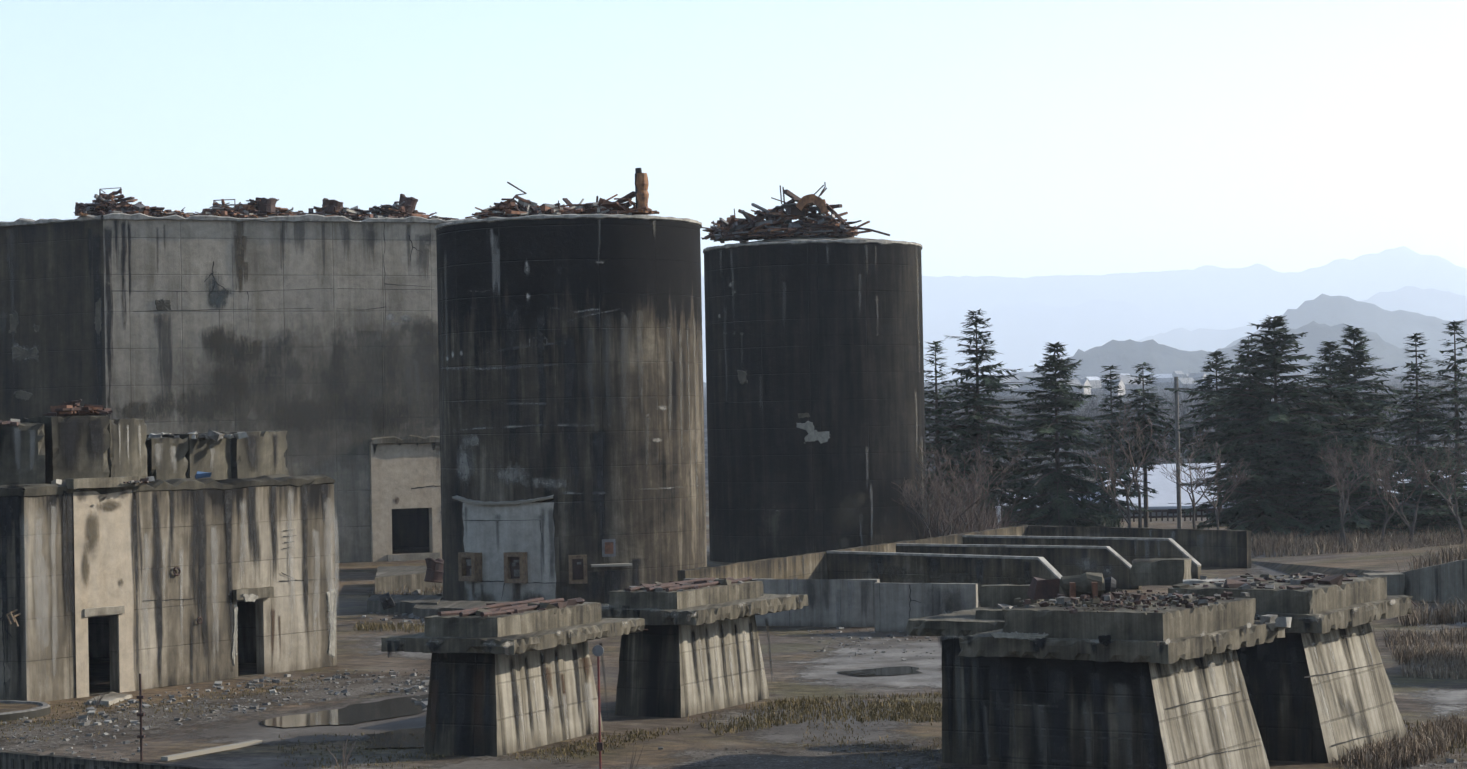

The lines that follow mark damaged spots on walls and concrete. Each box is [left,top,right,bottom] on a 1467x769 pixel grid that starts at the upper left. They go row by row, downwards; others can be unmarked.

water stain [61,220,298,469]
water stain [388,256,643,554]
water stain [646,320,704,505]
spalling [796,412,830,444]
water stain [0,483,21,692]
water stain [62,490,83,674]
water stain [101,489,207,686]
water stain [224,485,278,644]
water stain [301,483,328,628]
water stain [591,558,646,693]